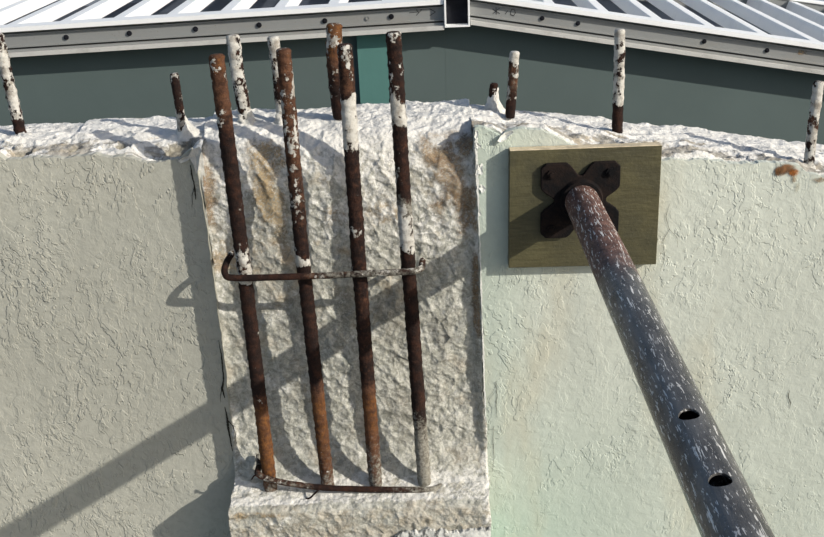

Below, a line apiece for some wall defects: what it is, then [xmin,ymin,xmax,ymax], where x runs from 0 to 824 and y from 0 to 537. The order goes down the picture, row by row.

spalling [470,29,824,175]
rust [247,143,287,236]
rust [422,135,477,233]
rust [775,164,798,182]
spalling [0,23,491,537]
crack [219,344,235,451]